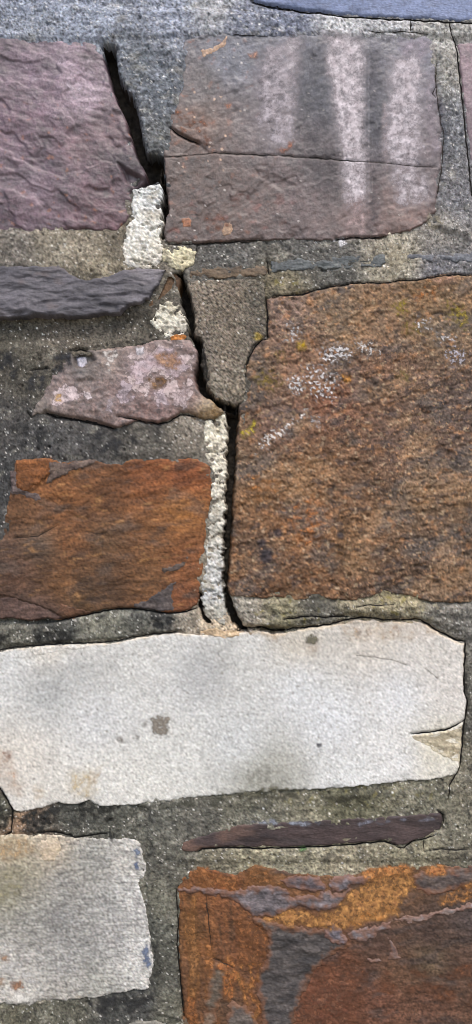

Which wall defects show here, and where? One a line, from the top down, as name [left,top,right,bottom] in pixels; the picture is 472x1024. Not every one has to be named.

leakage [257,37,300,145]
crack [103,2,472,367]
leakage [323,33,371,234]
leakage [384,39,439,205]
crack [0,274,468,851]